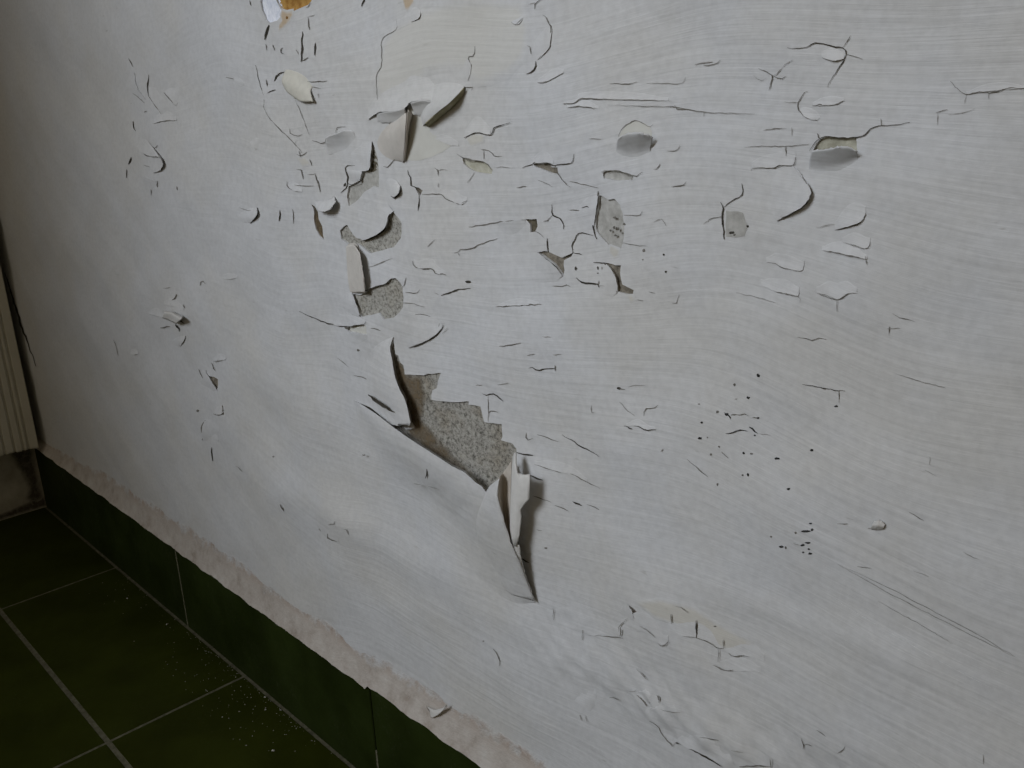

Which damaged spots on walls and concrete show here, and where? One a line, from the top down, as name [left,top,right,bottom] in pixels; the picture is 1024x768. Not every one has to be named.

peeling [312,126,355,155]
spalling [299,178,423,344]
peeling [368,0,533,180]
spalling [528,193,637,303]
peeling [616,120,653,157]
crack [705,187,749,238]
crack [750,35,861,153]
peeling [751,118,910,221]
crack [936,81,1024,124]
spalling [392,345,536,603]
water stain [35,434,555,768]
crack [547,597,765,672]